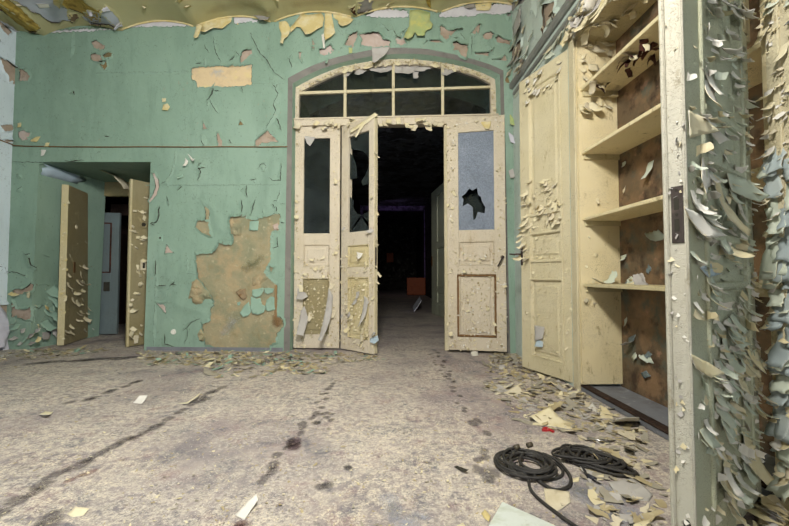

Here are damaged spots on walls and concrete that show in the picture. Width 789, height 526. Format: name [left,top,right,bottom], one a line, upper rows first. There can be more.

crack [205,83,243,114]
crack [228,33,295,132]
crack [146,134,285,248]
spalling [128,118,383,398]
peeling [0,256,107,386]
peeling [446,247,668,526]
peeling [123,405,505,526]